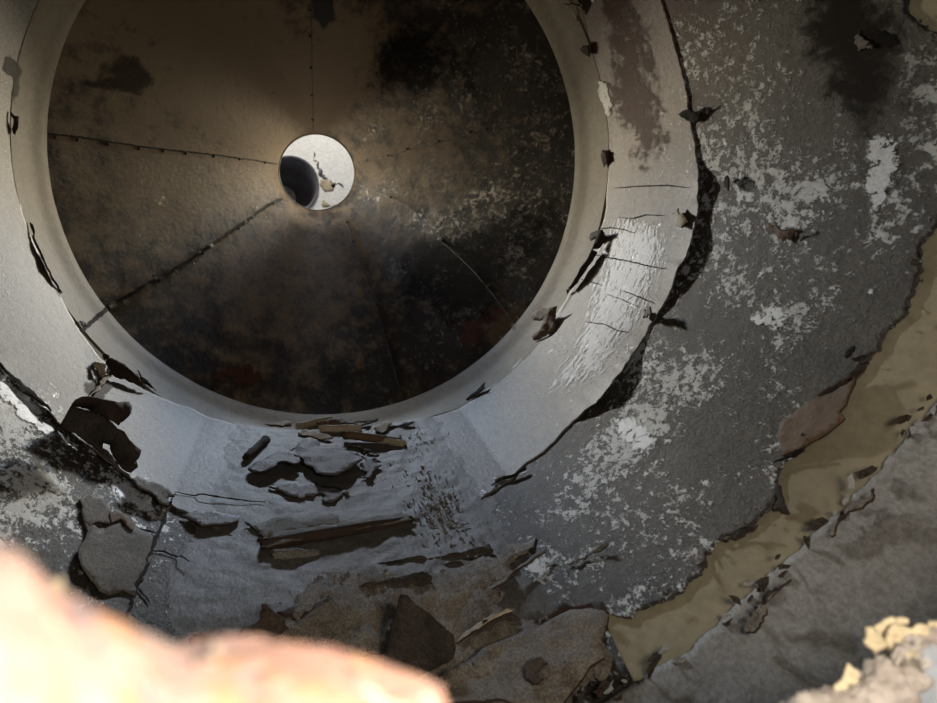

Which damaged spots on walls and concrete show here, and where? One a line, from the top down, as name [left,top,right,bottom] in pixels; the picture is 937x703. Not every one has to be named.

crack [615,182,689,190]
crack [598,214,665,233]
peeling [767,224,795,242]
crack [597,255,666,269]
crack [581,279,653,305]
peeling [774,346,869,463]
peeling [59,354,174,507]
peeling [242,435,300,473]
peeling [78,494,153,596]
crack [124,492,266,622]
peeling [270,548,320,559]
peeling [578,394,937,703]